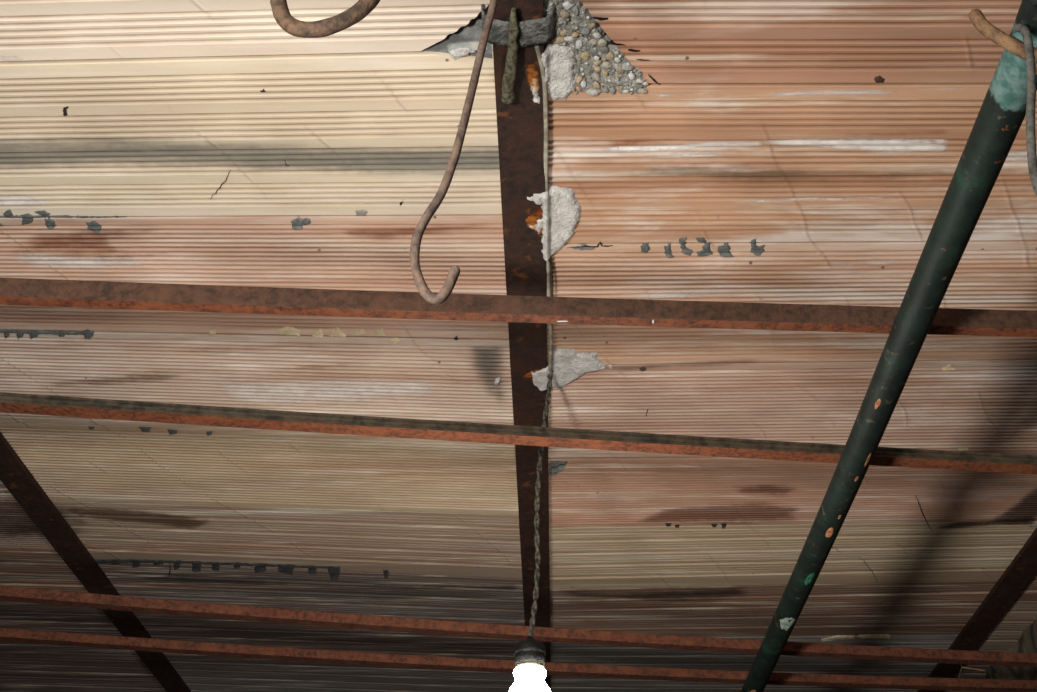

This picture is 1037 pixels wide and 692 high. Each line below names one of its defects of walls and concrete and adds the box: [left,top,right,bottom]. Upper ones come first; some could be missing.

spalling [543,0,649,96]
peeling [527,194,543,234]
peeling [531,366,549,391]
damp [60,510,203,526]